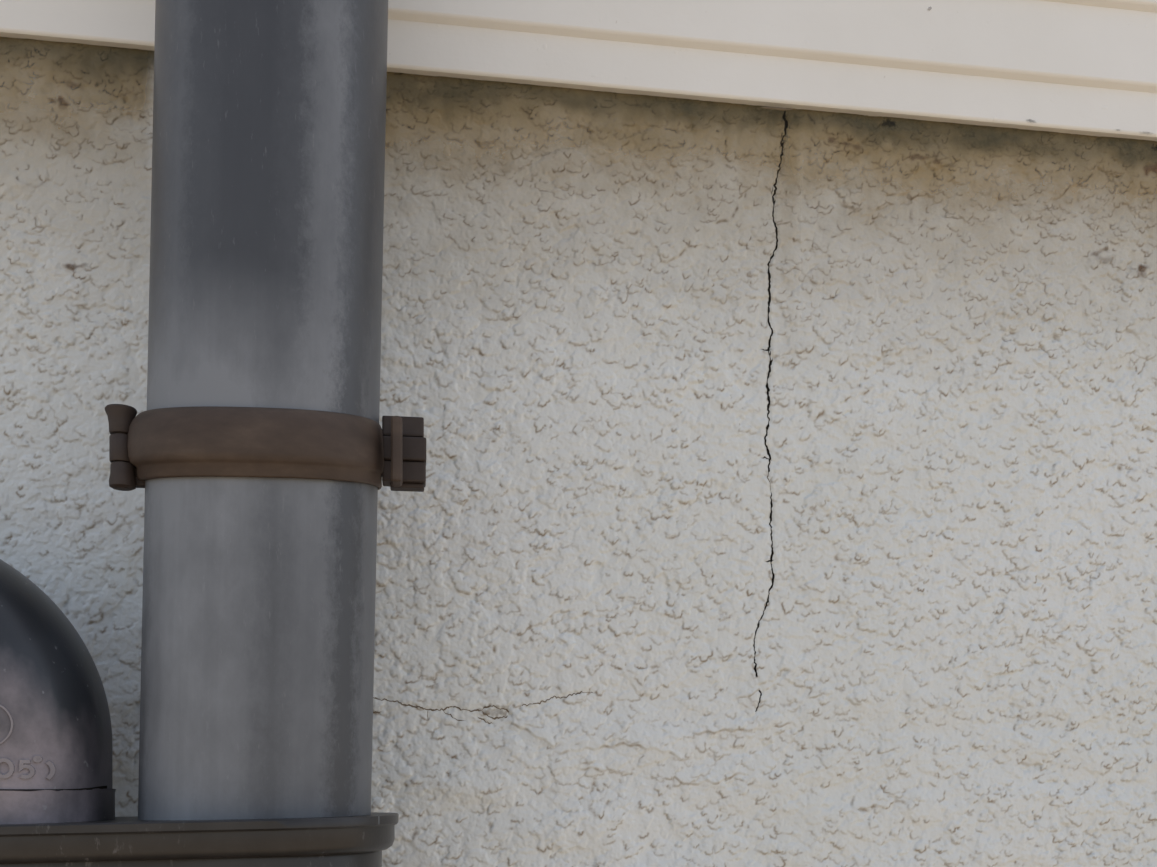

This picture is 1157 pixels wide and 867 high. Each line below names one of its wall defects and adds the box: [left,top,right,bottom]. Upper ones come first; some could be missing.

crack [753,111,788,712]
leakage [385,72,1157,205]